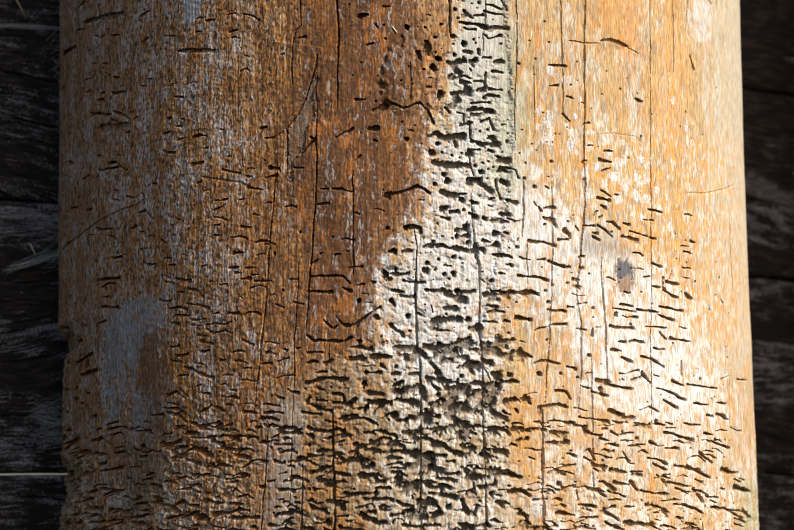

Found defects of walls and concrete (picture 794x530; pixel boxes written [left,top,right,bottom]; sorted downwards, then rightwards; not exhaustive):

crack [286,25,319,345]
crack [334,0,342,101]
crack [414,228,423,530]